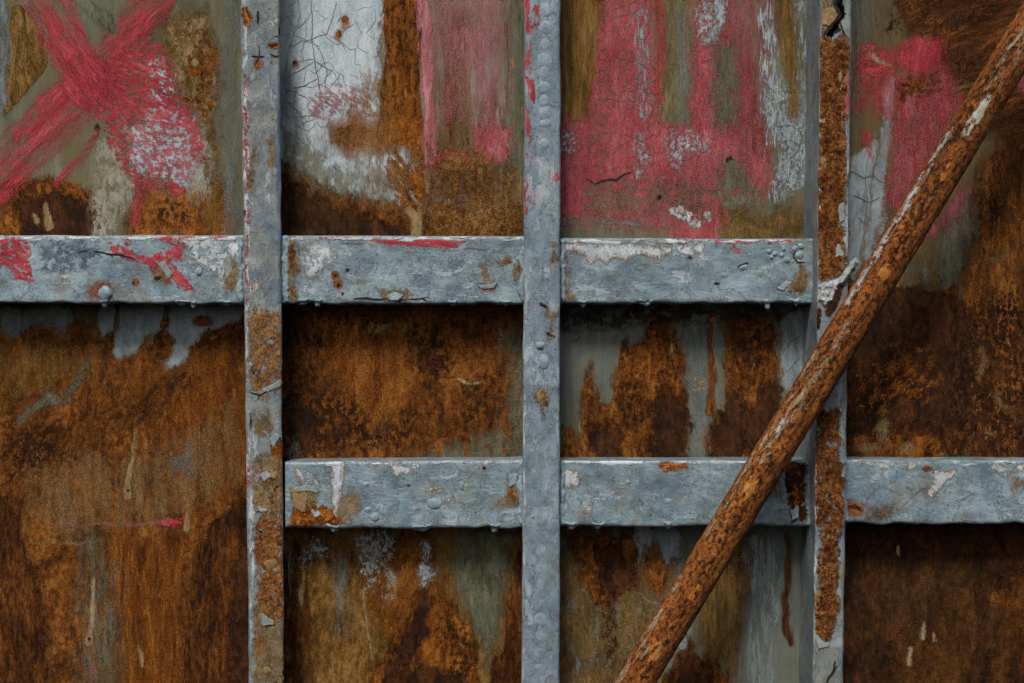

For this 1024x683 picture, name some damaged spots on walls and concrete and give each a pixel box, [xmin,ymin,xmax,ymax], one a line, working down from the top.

peeling [92,0,420,526]
rust [0,0,523,683]
crack [241,0,384,152]
peeling [560,204,712,265]
rust [560,310,784,472]
crack [562,0,805,210]
peeling [665,129,712,168]
peeling [693,0,729,47]
rust [777,32,852,294]
rust [641,86,1024,683]
peeling [843,27,1024,305]
rust [559,525,673,683]